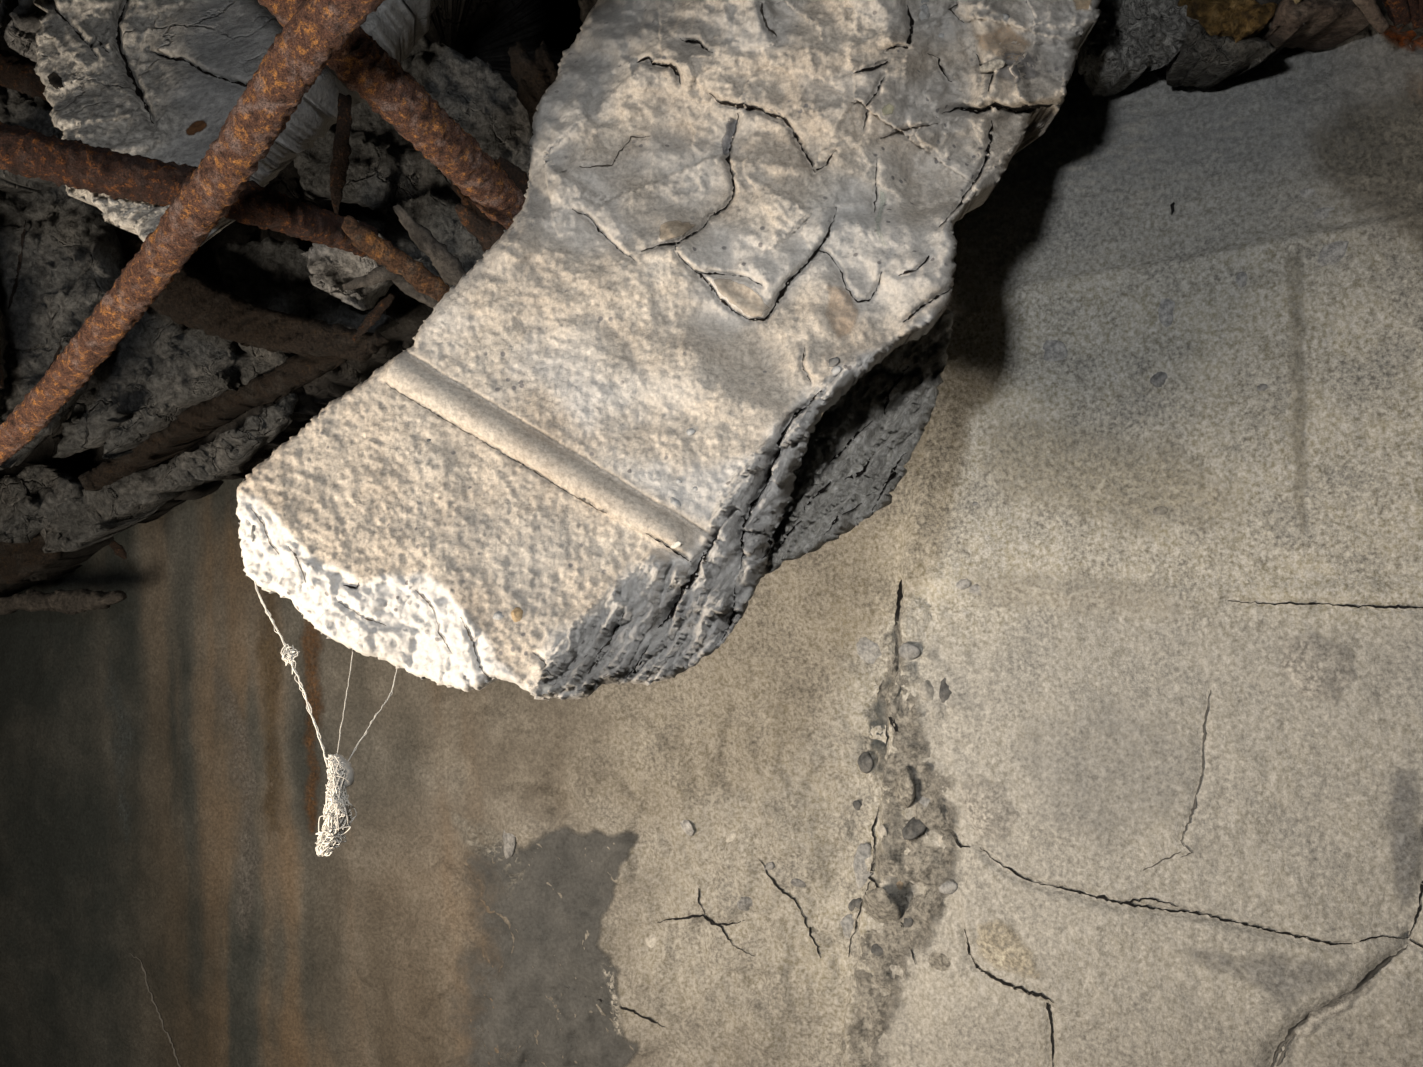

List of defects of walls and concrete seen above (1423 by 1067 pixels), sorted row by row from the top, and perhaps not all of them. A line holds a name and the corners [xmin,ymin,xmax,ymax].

corrosion [1352,0,1423,51]
corrosion [115,226,143,268]
spalling [0,0,526,466]
corrosion [78,263,391,491]
crack [877,579,902,746]
crack [1228,600,1423,609]
water stain [458,818,637,1067]
crack [657,888,755,957]
crack [759,807,879,958]
crack [950,690,1423,1067]